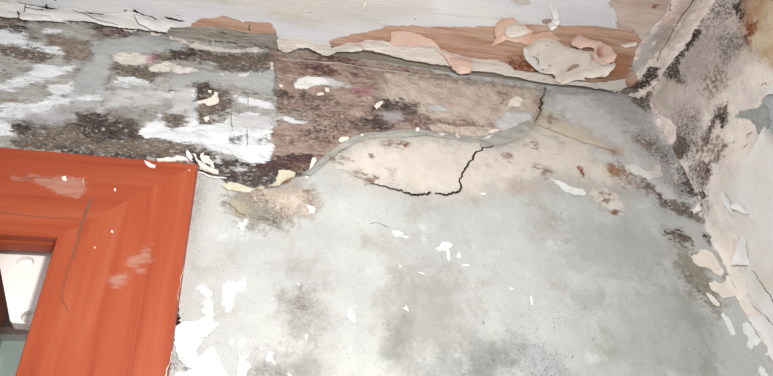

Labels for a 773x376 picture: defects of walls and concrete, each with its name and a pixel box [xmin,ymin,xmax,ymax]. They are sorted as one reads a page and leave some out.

crack [655,0,694,76]
damp [718,0,773,61]
damp [0,16,428,230]
flaking render [0,0,719,193]
crack [341,144,494,196]
damp [544,1,744,223]
peeling [174,277,257,376]
damp [662,227,721,316]
peeling [691,249,762,350]